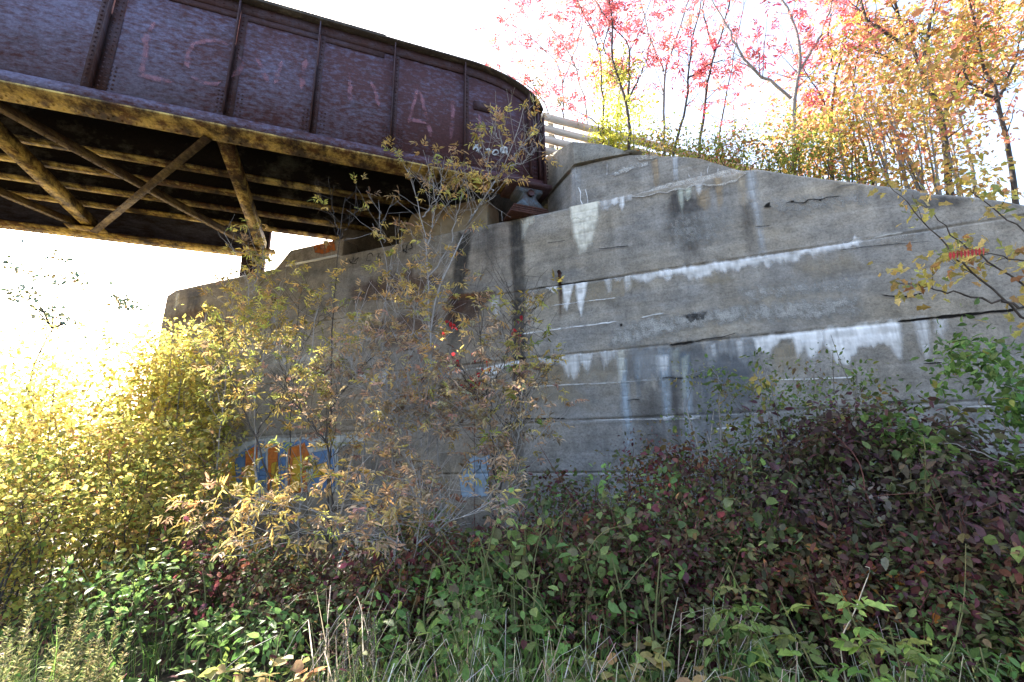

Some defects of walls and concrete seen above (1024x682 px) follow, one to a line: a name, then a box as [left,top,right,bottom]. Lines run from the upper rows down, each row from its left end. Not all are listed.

damp [570,187,624,250]
crack [786,183,860,203]
damp [600,232,928,288]
damp [480,219,533,394]
damp [754,320,900,380]
damp [658,349,702,437]